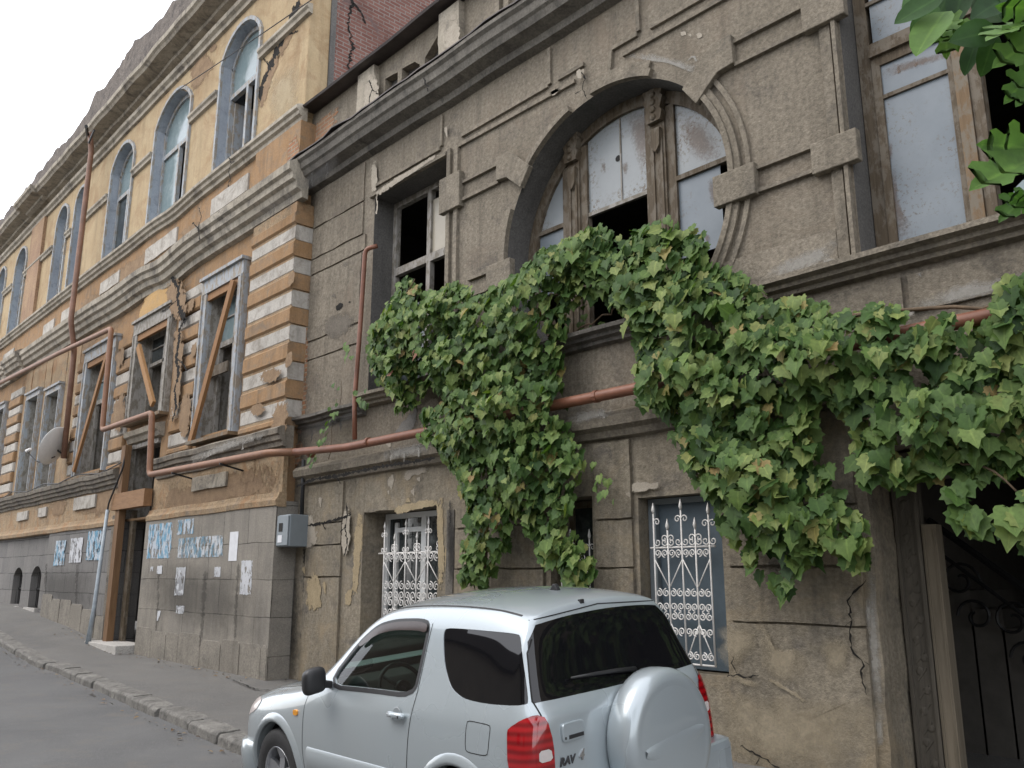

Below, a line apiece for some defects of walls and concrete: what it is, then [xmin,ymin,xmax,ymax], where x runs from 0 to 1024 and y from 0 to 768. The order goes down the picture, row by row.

crack [258,0,303,108]
crack [347,0,378,103]
peeling [371,155,438,214]
crack [162,276,188,422]
spalling [250,399,303,466]
crack [297,457,435,556]
peeling [387,466,446,589]
peeling [302,566,326,611]
crack [845,580,869,695]